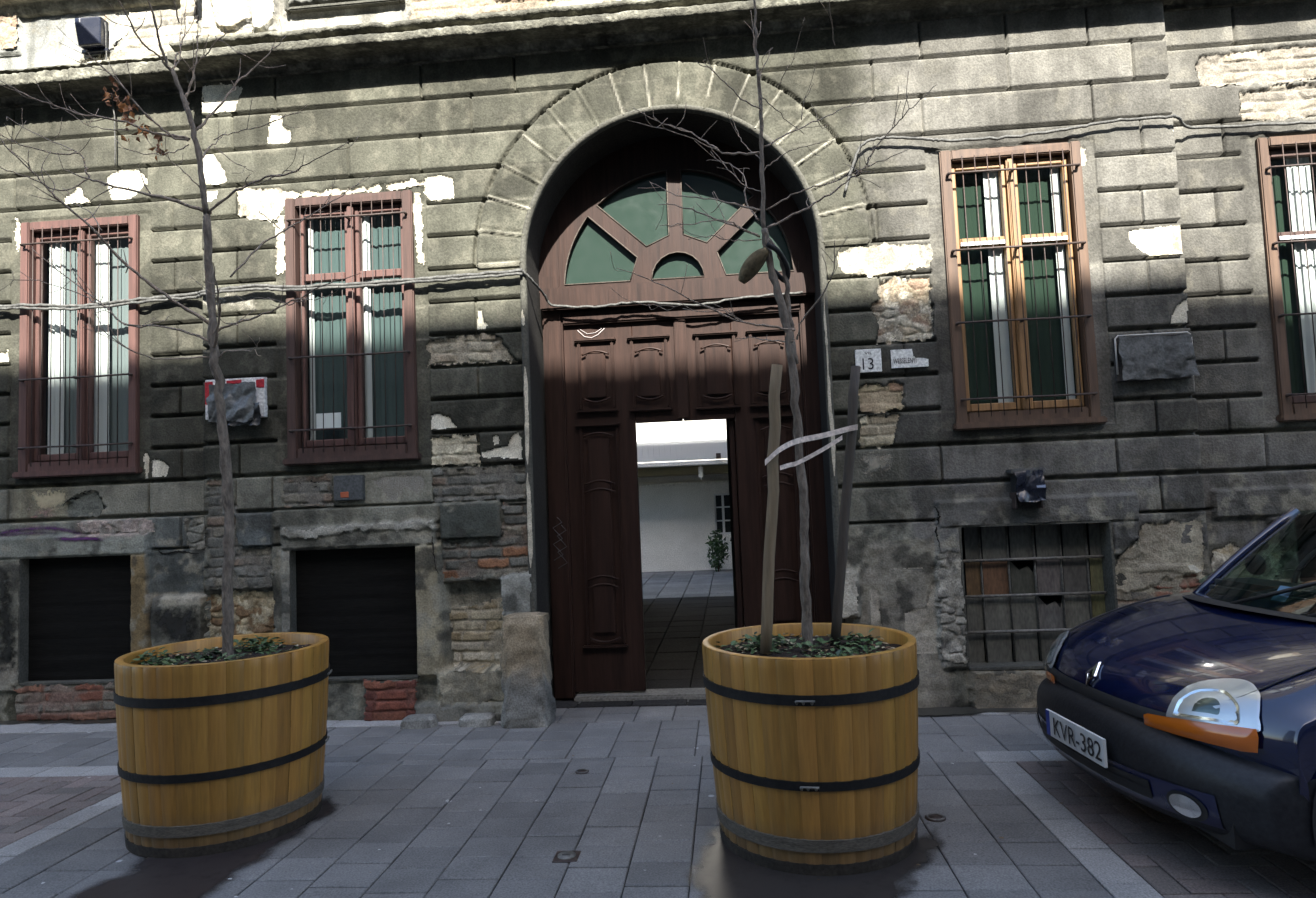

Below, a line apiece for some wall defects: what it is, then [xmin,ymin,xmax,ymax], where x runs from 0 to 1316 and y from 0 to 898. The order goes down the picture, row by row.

flaking render [409,0,620,20]
flaking render [1195,44,1316,122]
peeling [64,187,90,204]
peeling [107,169,148,200]
spalling [203,154,454,275]
peeling [1129,225,1182,259]
flaking render [837,242,934,345]
flaking render [183,311,533,638]
spalling [842,571,882,627]
spalling [894,551,1047,709]
flaking render [1115,520,1240,608]